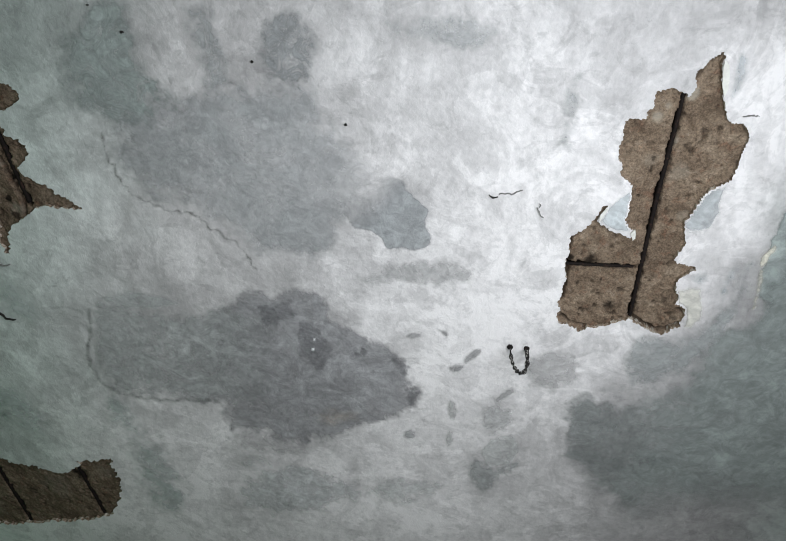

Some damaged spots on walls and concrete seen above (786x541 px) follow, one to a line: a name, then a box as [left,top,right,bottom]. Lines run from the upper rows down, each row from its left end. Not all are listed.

spalling [0,83,19,111]
spalling [0,127,82,253]
leakage [65,3,341,254]
spalling [556,52,750,335]
spalling [0,458,122,525]
leakage [97,289,420,453]
leakage [568,400,618,454]
leakage [600,213,786,502]